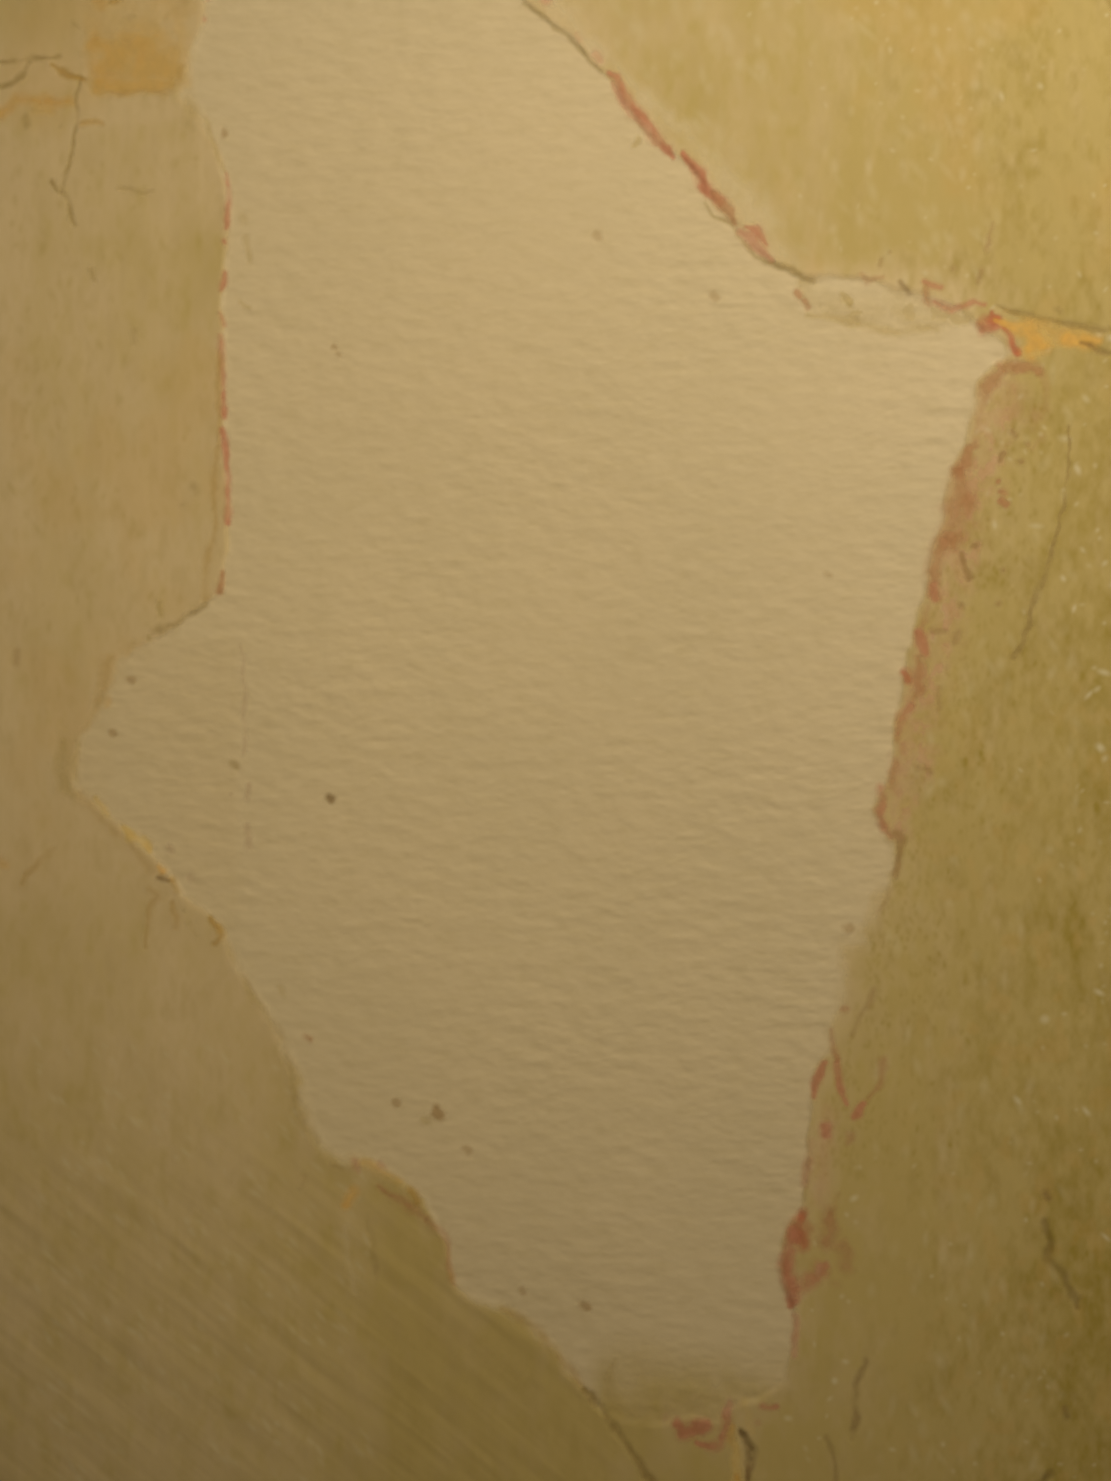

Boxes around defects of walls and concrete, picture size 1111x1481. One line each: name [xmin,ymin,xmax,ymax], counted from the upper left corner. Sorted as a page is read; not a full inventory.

crack [0,55,86,226]
spalling [979,311,1049,358]
crack [999,306,1107,353]
peeling [74,0,1006,1398]